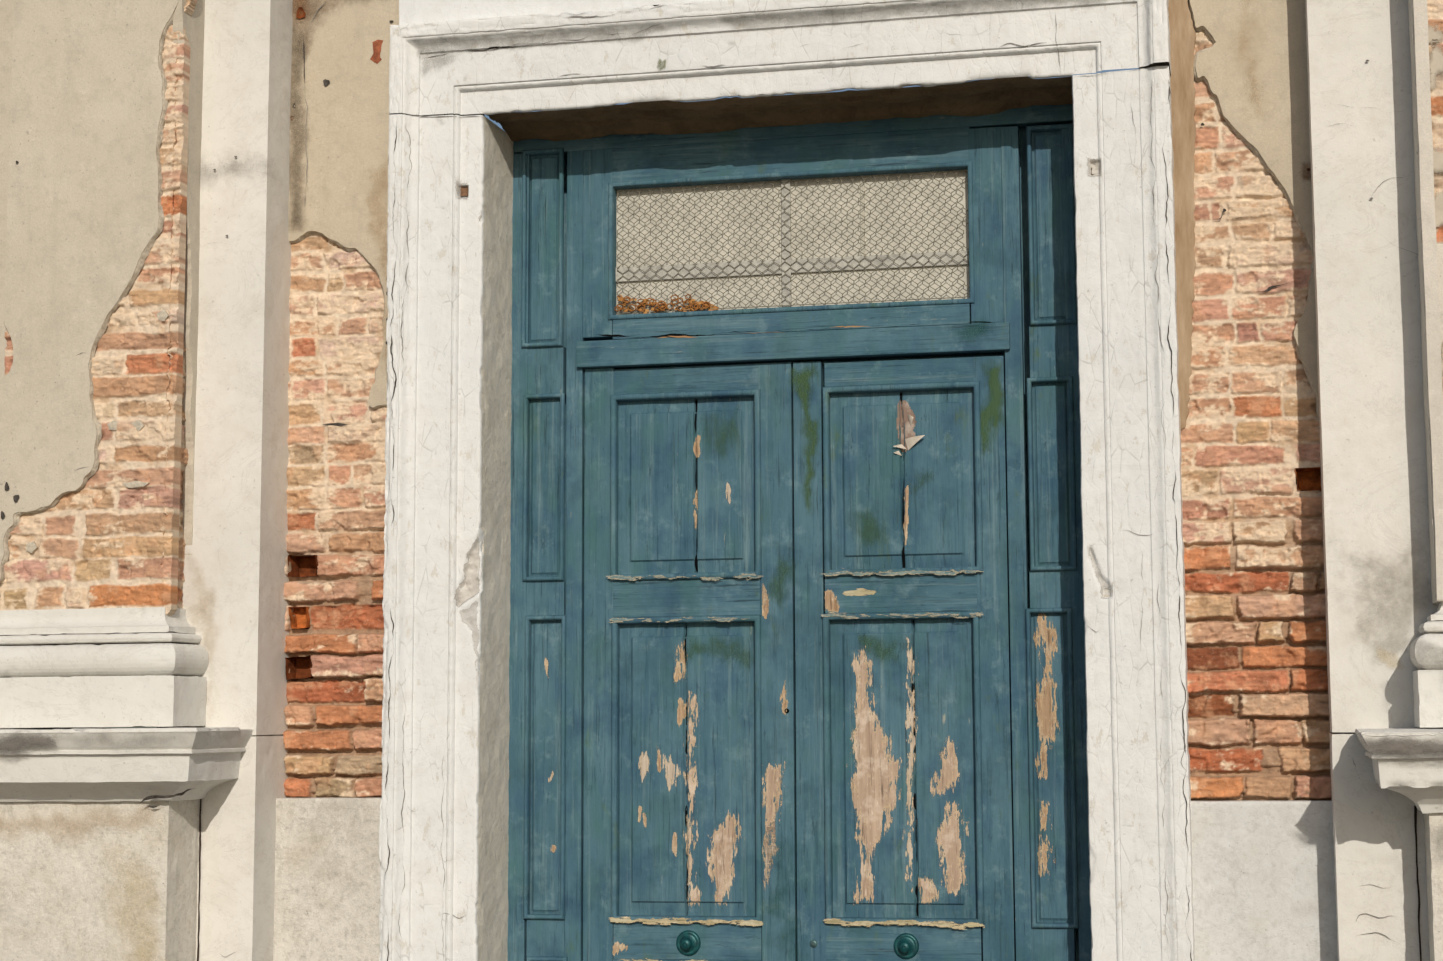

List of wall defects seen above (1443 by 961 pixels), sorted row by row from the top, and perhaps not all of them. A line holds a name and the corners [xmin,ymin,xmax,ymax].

flaking render [1427,0,1443,244]
flaking render [0,0,197,616]
crack [140,788,195,808]
flaking render [282,231,387,798]
peeling [638,641,741,906]
peeling [762,762,785,890]
peeling [824,588,875,613]
peeling [894,400,925,456]
peeling [850,638,969,905]
peeling [1037,801,1055,878]
peeling [1033,613,1060,780]
flaking render [1181,0,1345,801]